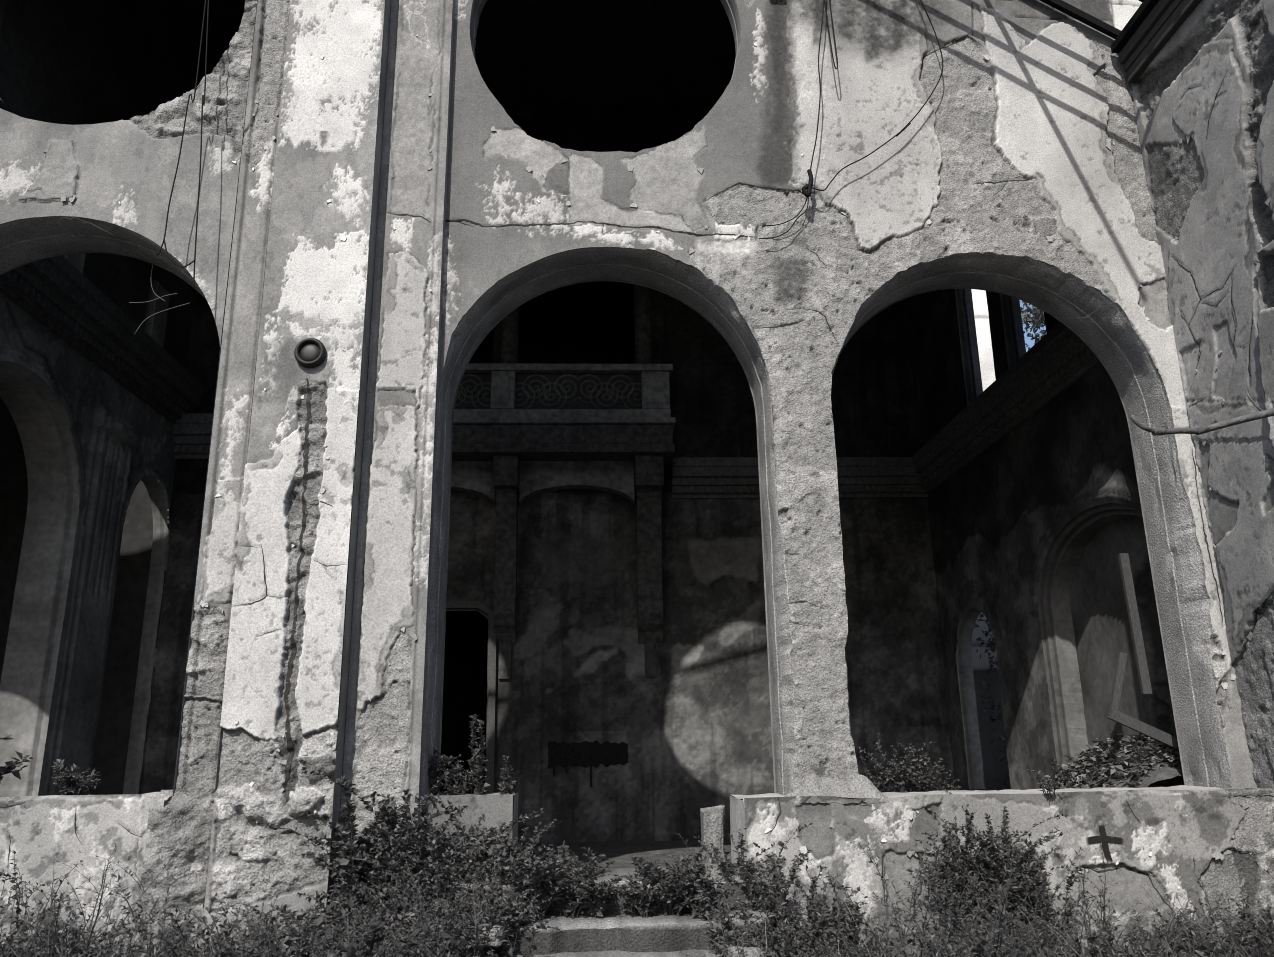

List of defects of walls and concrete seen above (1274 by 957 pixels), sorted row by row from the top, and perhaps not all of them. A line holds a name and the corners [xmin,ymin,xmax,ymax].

peeling [0,160,43,204]
peeling [112,186,137,231]
peeling [129,0,383,514]
spalling [387,0,467,251]
crack [389,212,757,238]
crack [706,182,815,201]
spalling [1080,0,1274,309]
crack [235,378,346,793]
peeling [412,230,463,590]
spalling [476,23,1108,935]
crack [1192,448,1274,666]